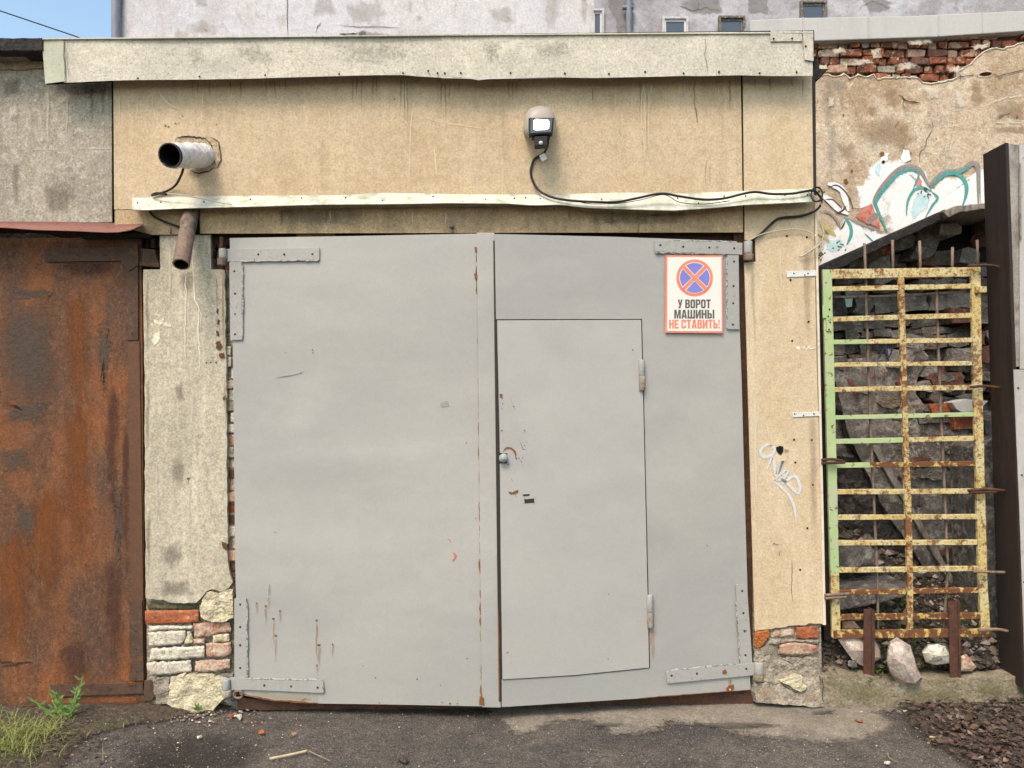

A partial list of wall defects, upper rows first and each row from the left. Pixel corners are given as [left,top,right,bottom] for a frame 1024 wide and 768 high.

spalling [813,34,1024,85]
corrosion [109,394,128,495]
spalling [145,587,239,718]
spalling [754,625,819,656]
spalling [779,673,806,692]